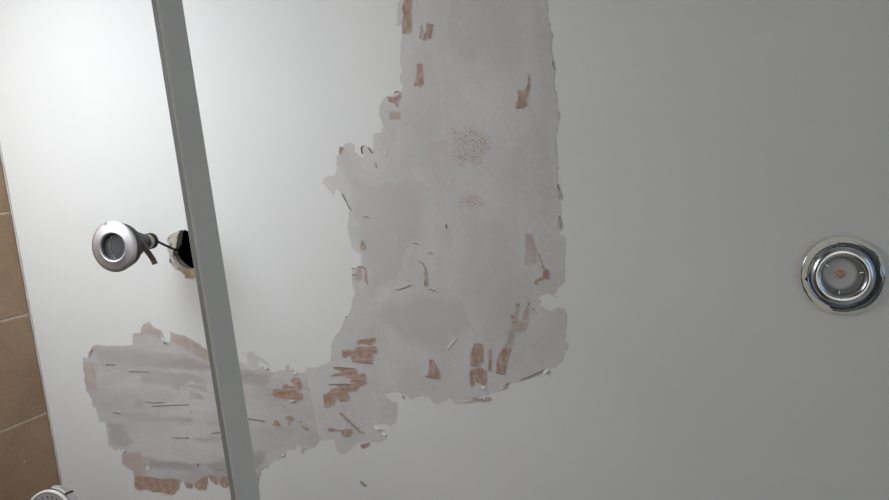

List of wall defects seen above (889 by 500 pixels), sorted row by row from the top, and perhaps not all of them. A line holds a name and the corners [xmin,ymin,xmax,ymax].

peeling [82,322,229,494]
peeling [239,0,568,484]